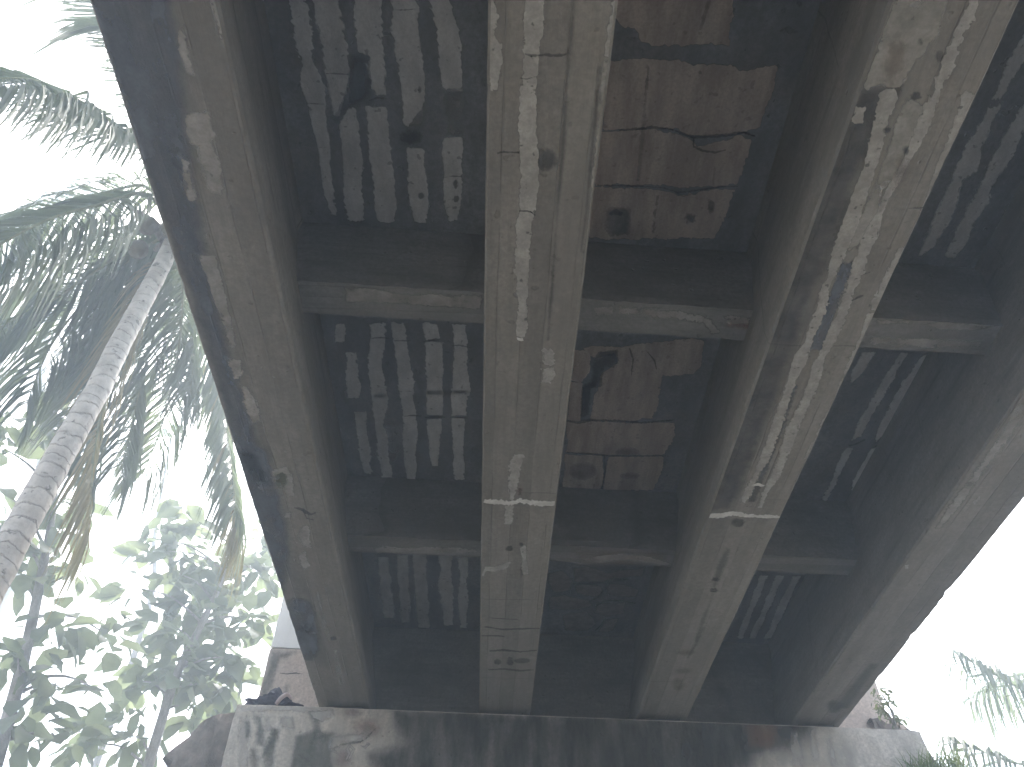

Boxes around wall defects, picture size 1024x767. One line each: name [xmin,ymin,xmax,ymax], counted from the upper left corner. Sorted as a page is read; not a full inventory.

peeling [289,0,464,223]
peeling [513,0,545,341]
peeling [584,0,778,256]
crack [620,125,755,154]
peeling [741,0,987,508]
peeling [918,34,1024,258]
peeling [334,322,471,480]
peeling [562,338,704,491]
peeling [374,546,478,628]
peeling [736,575,801,639]